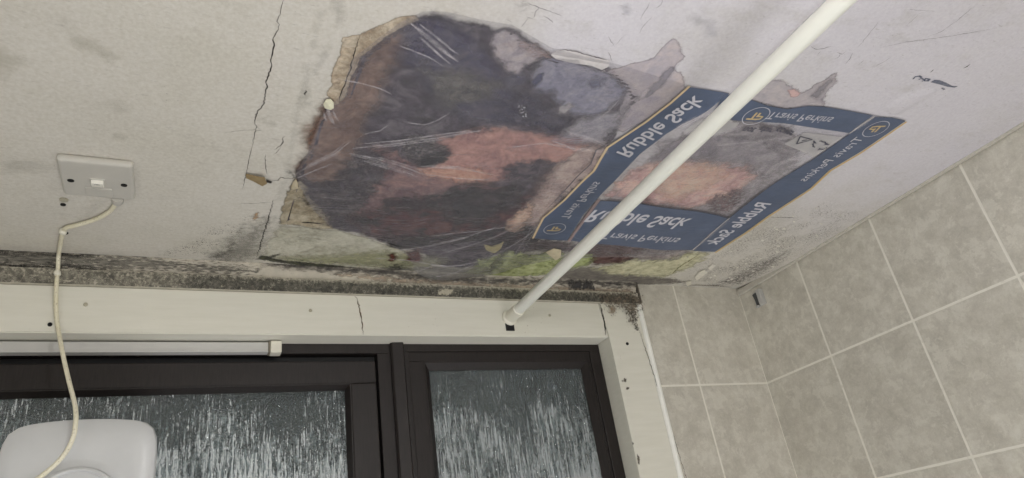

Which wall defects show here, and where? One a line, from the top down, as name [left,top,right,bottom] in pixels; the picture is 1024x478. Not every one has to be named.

crack [232,0,293,253]
spalling [264,15,799,269]
peeling [751,73,837,109]
water stain [0,225,709,331]